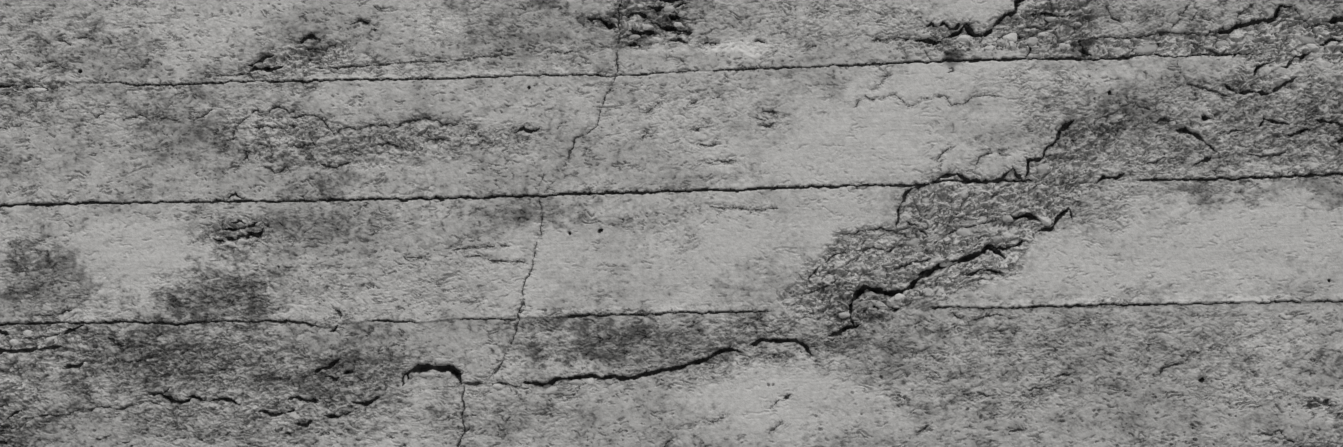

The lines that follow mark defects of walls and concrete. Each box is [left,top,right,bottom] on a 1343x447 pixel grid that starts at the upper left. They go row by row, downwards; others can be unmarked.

peeling [587,0,716,49]
crack [315,53,515,69]
spalling [773,0,1343,339]
crack [401,1,835,447]
crack [963,363,1075,397]